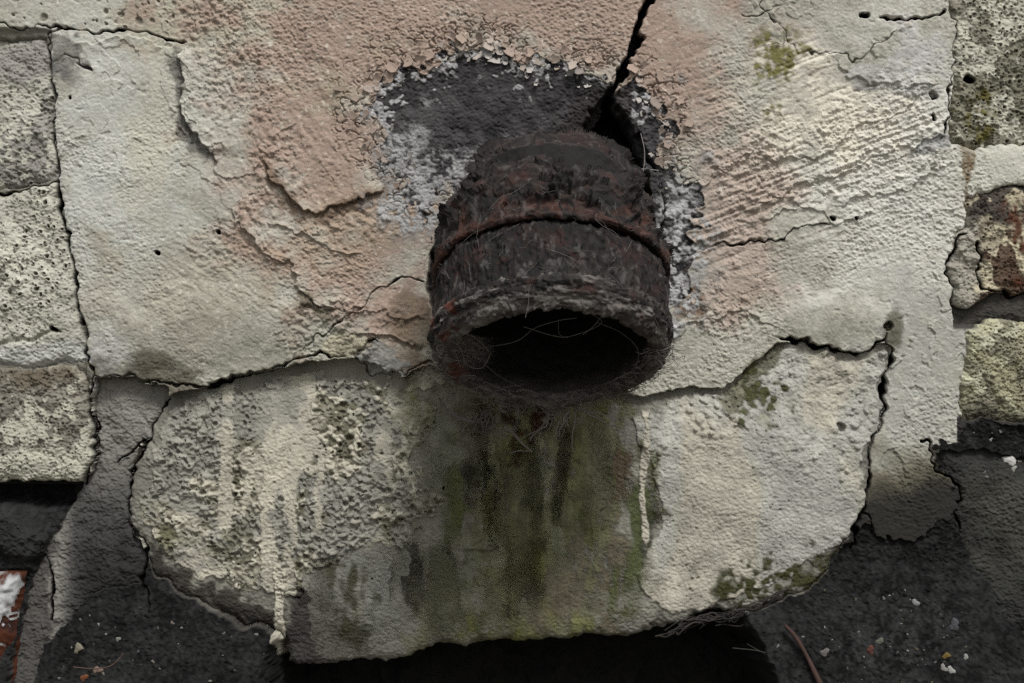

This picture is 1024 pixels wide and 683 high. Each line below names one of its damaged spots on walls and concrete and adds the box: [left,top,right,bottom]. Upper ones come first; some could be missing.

spalling [168,55,216,162]
peeling [263,24,704,305]
crack [706,223,829,249]
crack [742,0,956,133]
crack [0,182,171,620]
crack [194,277,423,388]
leakage [610,449,661,604]
peeling [633,343,888,613]
crack [780,334,893,539]